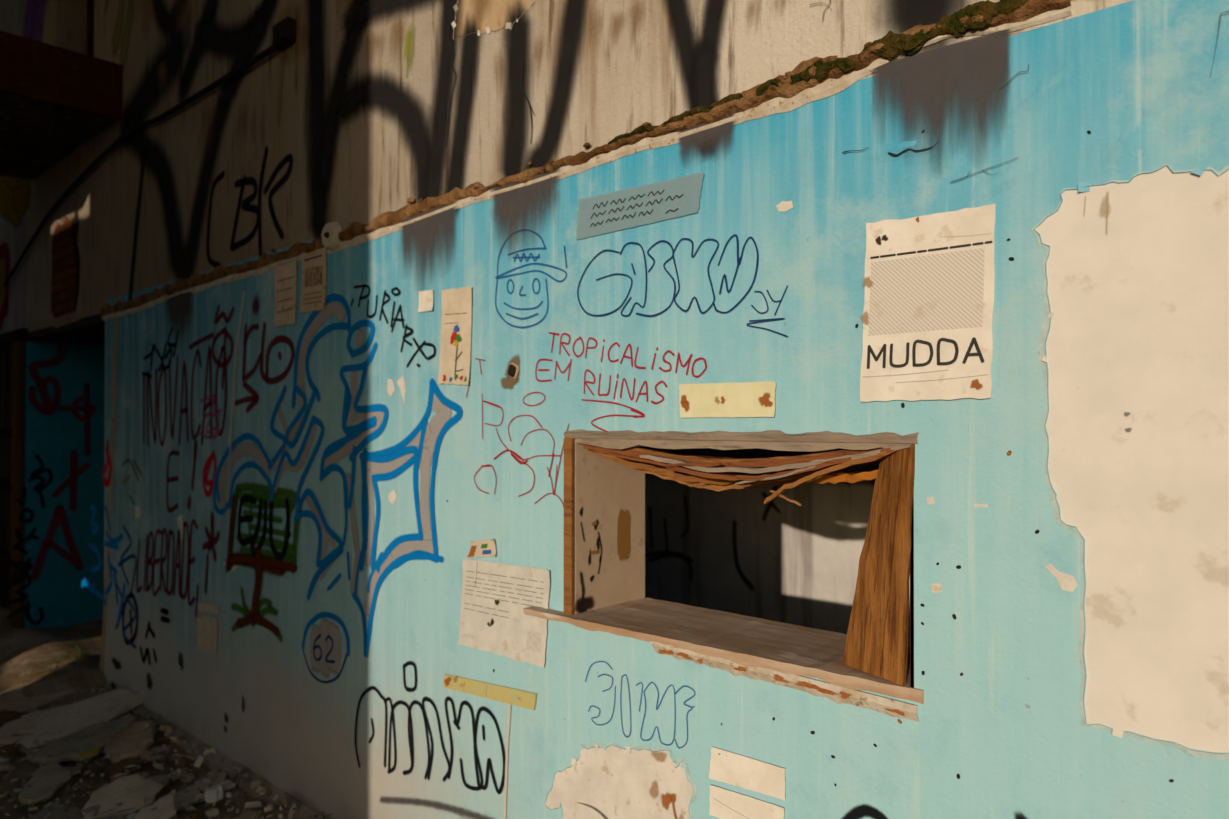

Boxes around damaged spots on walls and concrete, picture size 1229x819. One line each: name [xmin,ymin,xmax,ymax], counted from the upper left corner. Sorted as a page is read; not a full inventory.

peeling [451,0,536,40]
peeling [776,201,793,212]
flaking render [47,198,86,328]
peeling [1031,164,1229,760]
peeling [544,742,698,819]